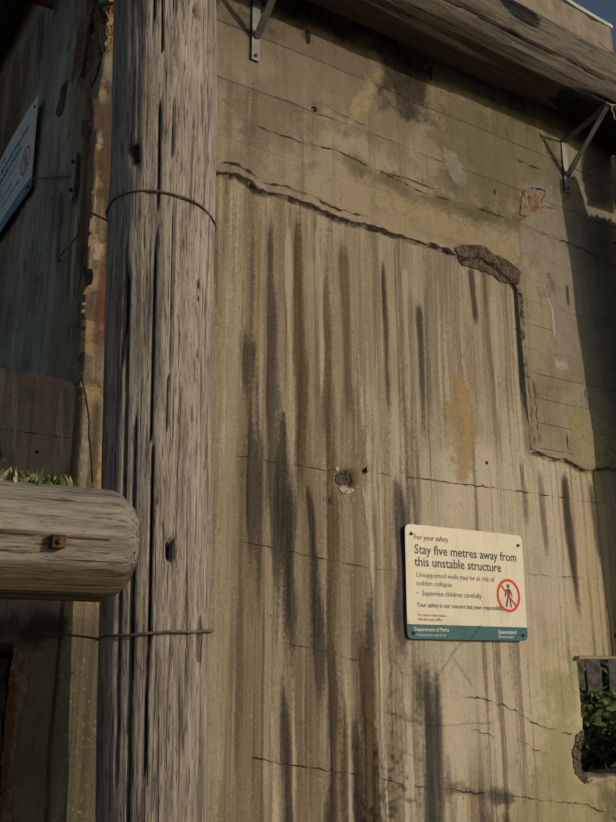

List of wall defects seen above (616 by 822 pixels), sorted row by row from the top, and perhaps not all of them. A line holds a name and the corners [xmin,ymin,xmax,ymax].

spalling [55,80,68,117]
spalling [78,0,114,89]
crack [322,146,525,220]
crack [220,159,616,505]
leakage [243,223,389,822]
spalling [335,466,355,494]
leakage [393,482,415,654]
leakage [563,476,581,613]
spalling [0,648,29,822]
leakage [403,670,446,822]
crack [468,696,577,737]
crack [447,788,616,820]